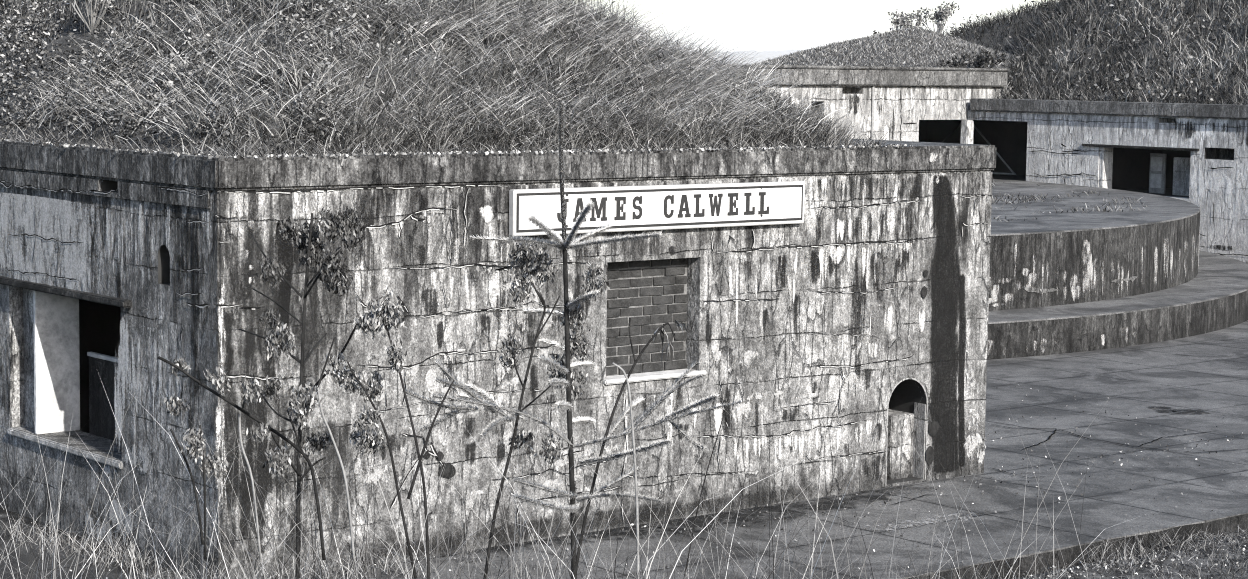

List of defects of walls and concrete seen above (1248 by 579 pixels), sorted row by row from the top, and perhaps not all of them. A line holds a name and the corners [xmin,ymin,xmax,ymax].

damp [0,193,150,298]
damp [420,236,467,348]
damp [480,206,531,261]
damp [729,255,757,324]
damp [776,176,918,391]
damp [919,175,966,473]
damp [1057,242,1103,299]
damp [1142,244,1232,278]
damp [114,210,356,563]
damp [465,403,505,465]
damp [667,382,818,462]
damp [486,491,890,551]